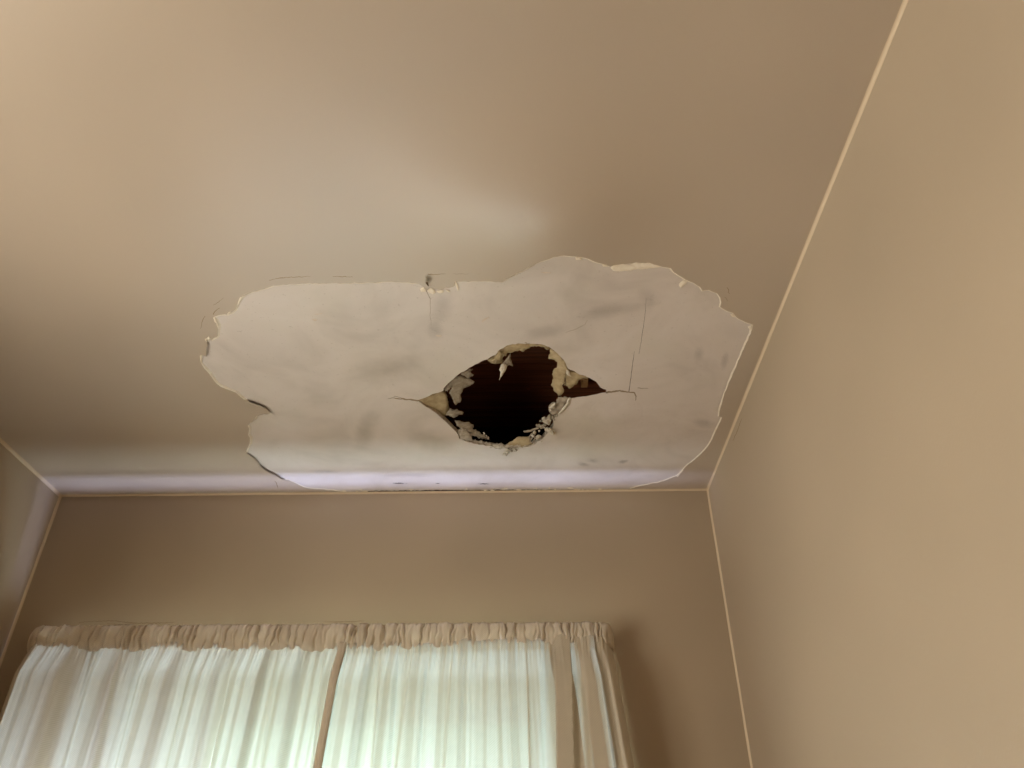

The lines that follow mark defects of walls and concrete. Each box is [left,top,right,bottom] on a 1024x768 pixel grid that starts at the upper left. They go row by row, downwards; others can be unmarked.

peeling [200,256,753,492]
crack [606,306,648,401]